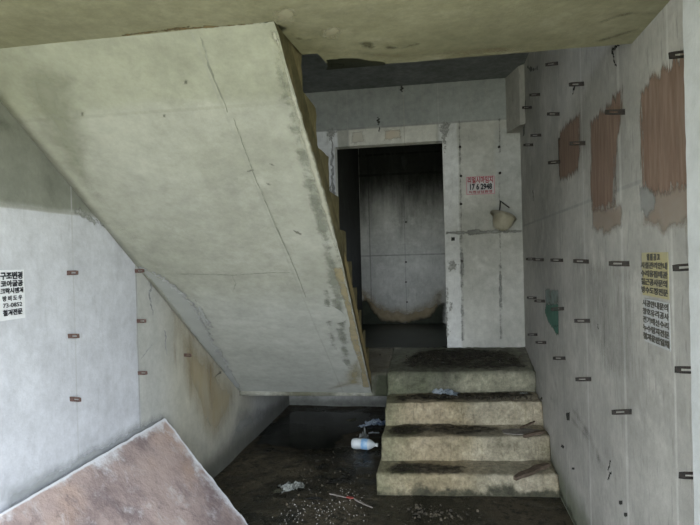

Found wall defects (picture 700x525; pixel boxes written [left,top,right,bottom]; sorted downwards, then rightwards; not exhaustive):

crack [148,37,306,310]
water stain [306,180,327,240]
peeling [558,116,580,181]
peeling [590,92,622,233]
peeling [639,53,687,232]
water stain [362,292,444,324]